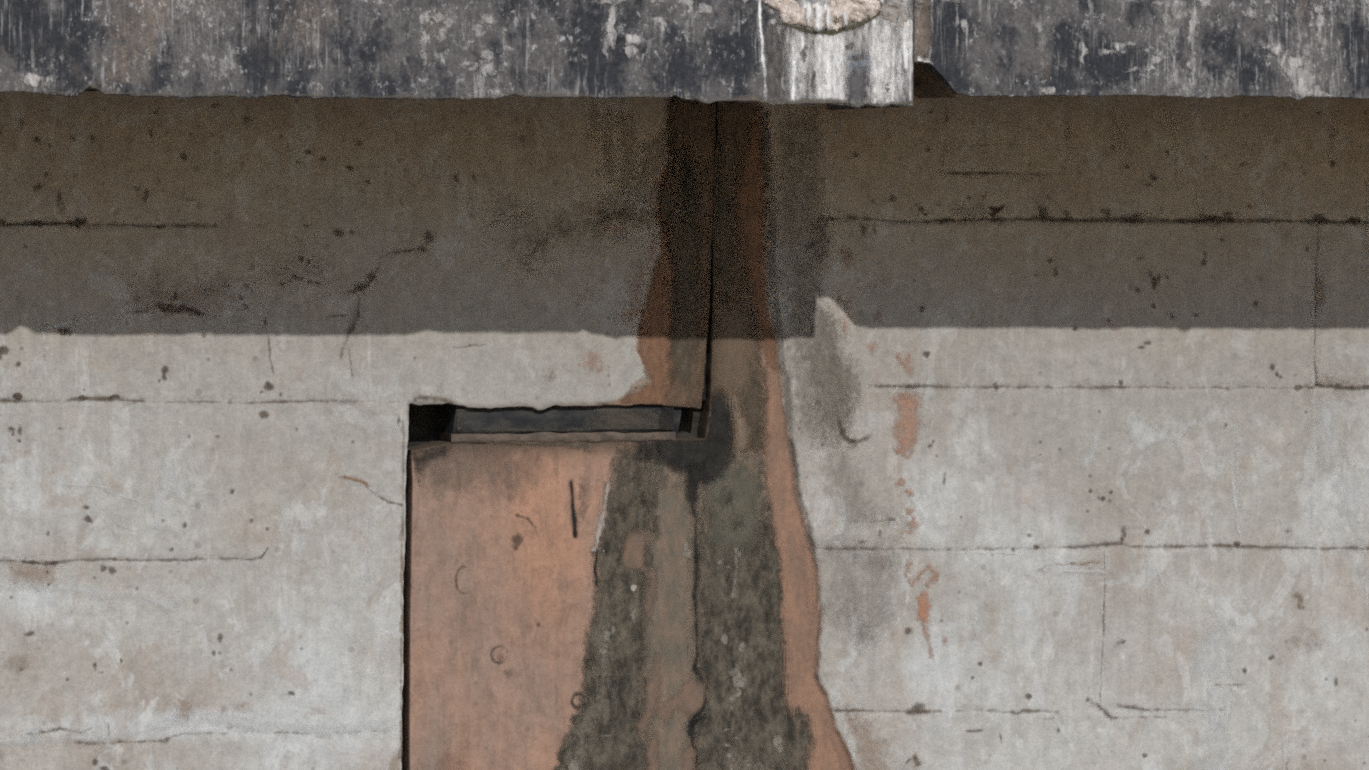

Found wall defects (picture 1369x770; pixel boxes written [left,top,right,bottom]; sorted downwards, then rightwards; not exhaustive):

damp [21,73,319,96]
damp [346,12,633,173]
damp [931,0,968,47]
peeling [621,104,715,438]
spalling [398,404,446,451]
damp [486,0,932,770]
peeling [735,117,853,770]